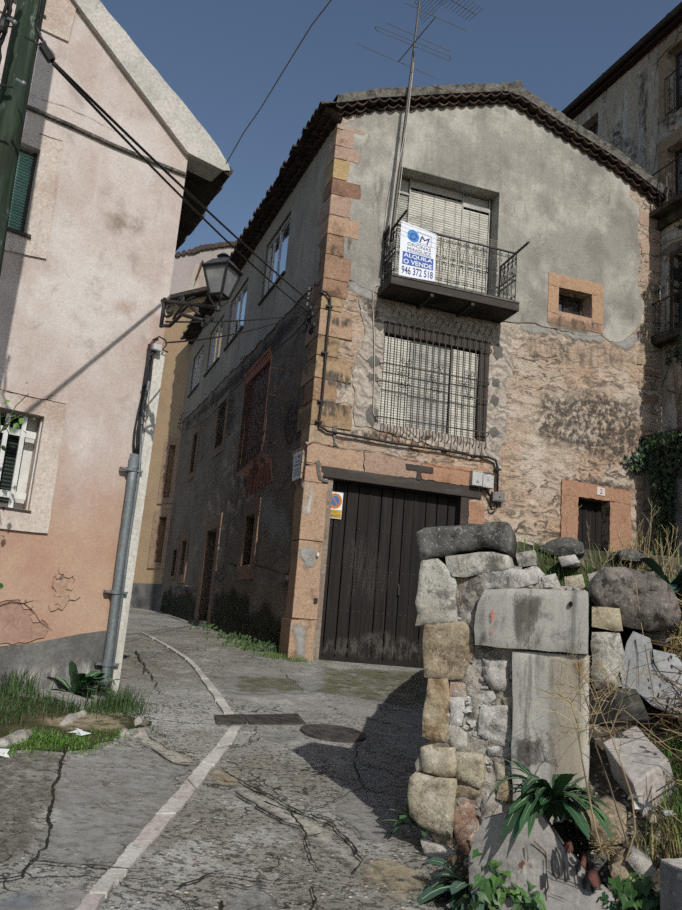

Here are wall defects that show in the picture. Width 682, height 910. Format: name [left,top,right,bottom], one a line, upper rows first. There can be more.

crack [0,600,49,628]
crack [148,722,295,763]
crack [0,744,380,910]